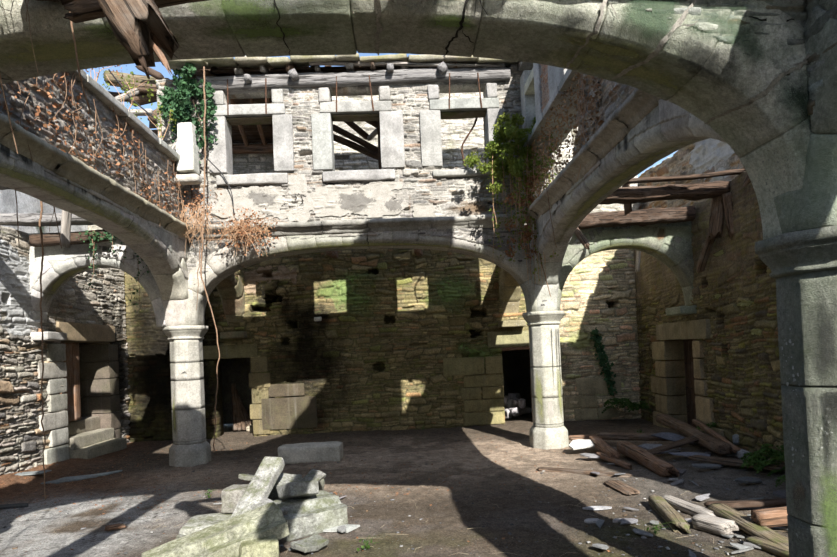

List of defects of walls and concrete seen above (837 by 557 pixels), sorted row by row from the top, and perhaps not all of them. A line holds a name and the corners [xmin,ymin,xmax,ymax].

crack [274,0,290,55]
crack [443,0,488,57]